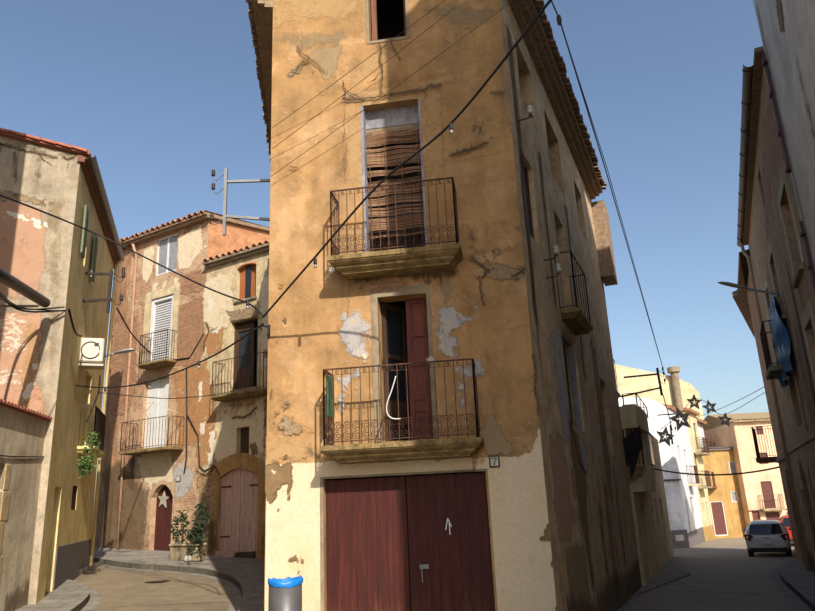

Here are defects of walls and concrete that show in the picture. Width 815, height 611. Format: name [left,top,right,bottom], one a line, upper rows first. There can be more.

crack [340,36,489,179]
peeling [4,211,48,230]
peeling [19,323,39,402]
flaking render [109,316,139,416]
peeling [338,369,361,412]
peeling [338,310,372,362]
peeling [426,298,485,407]
crack [468,254,489,303]
crack [497,177,543,416]
peeling [136,398,309,518]
damp [567,510,641,611]